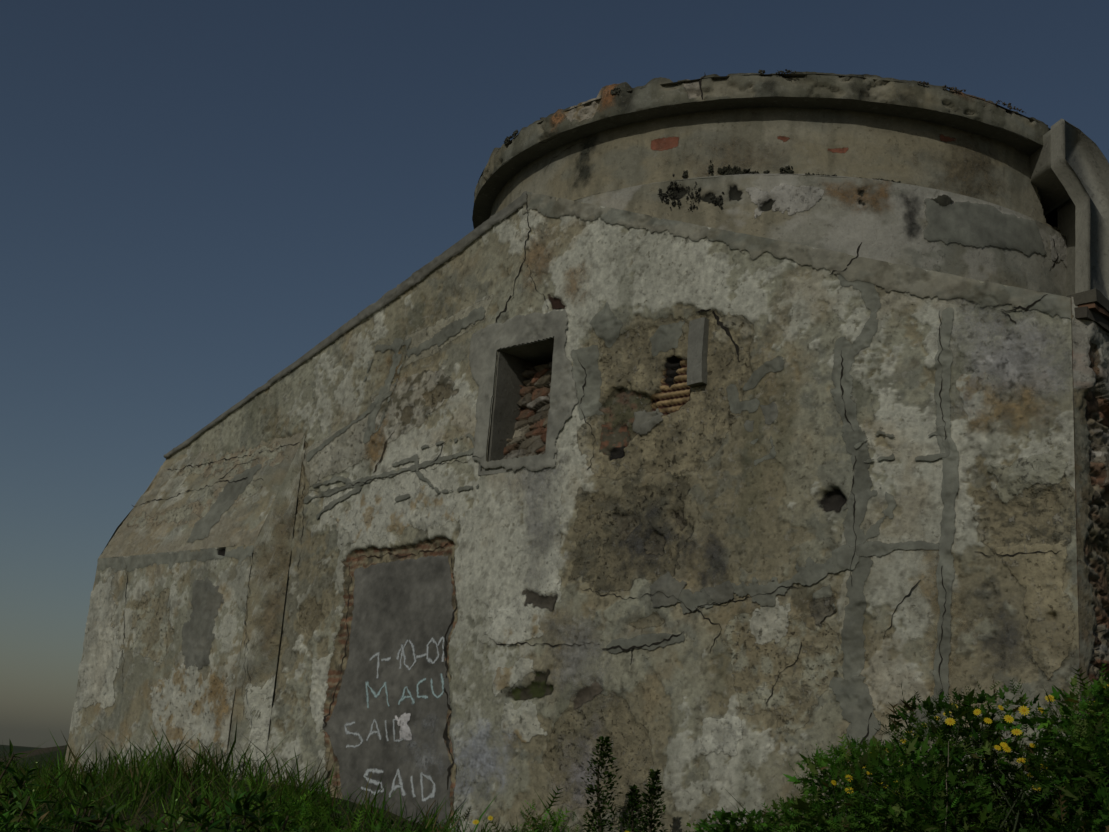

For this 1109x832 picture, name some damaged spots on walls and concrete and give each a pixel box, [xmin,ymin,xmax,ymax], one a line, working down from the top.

crack [496,194,548,322]
crack [937,311,946,439]
spalling [1088,342,1101,375]
crack [840,350,857,584]
peeling [485,309,754,814]
crack [883,567,946,703]